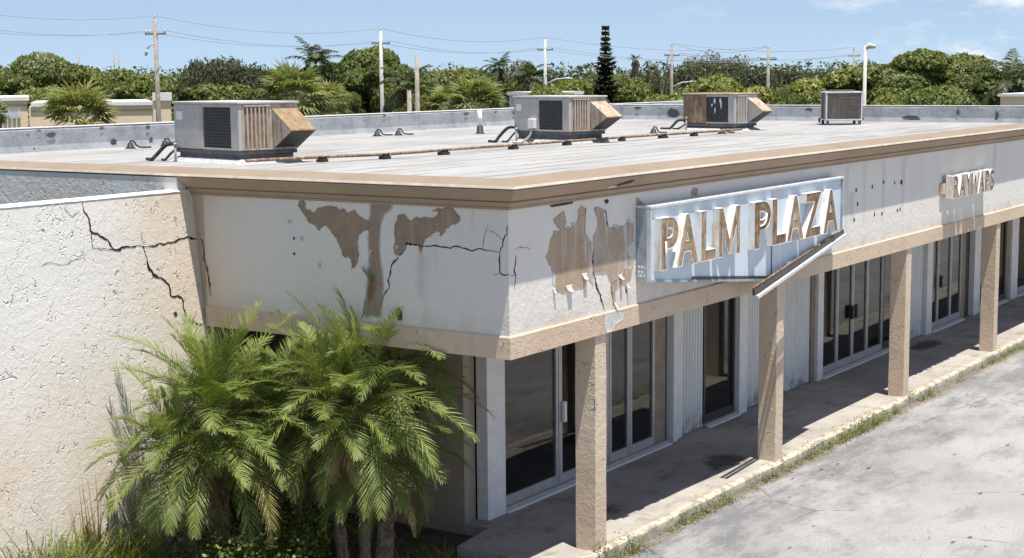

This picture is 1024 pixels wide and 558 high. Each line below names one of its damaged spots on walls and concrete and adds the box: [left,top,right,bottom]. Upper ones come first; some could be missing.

crack [42,203,211,329]
peeling [288,201,372,270]
peeling [393,207,460,256]
crack [361,225,532,319]
peeling [546,180,635,333]
crack [584,208,627,310]